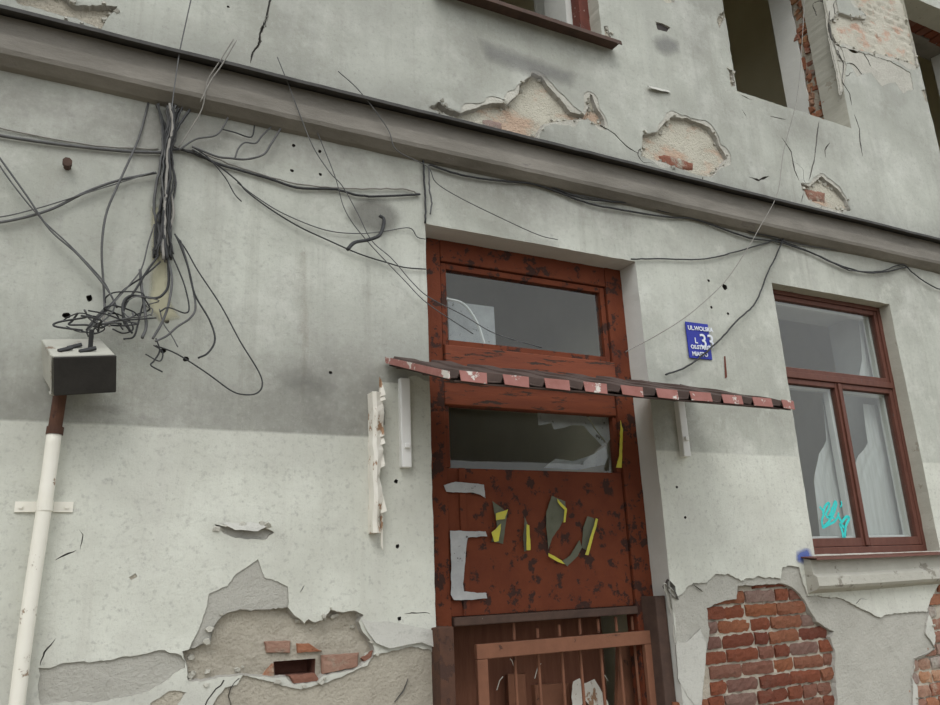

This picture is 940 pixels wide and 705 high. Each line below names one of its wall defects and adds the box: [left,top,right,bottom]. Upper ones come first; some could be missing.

spalling [16,0,120,29]
crack [250,0,271,62]
spalling [812,0,928,102]
spalling [429,70,608,138]
spalling [638,111,731,179]
spalling [791,160,850,213]
spalling [38,559,433,705]
spalling [663,566,940,705]